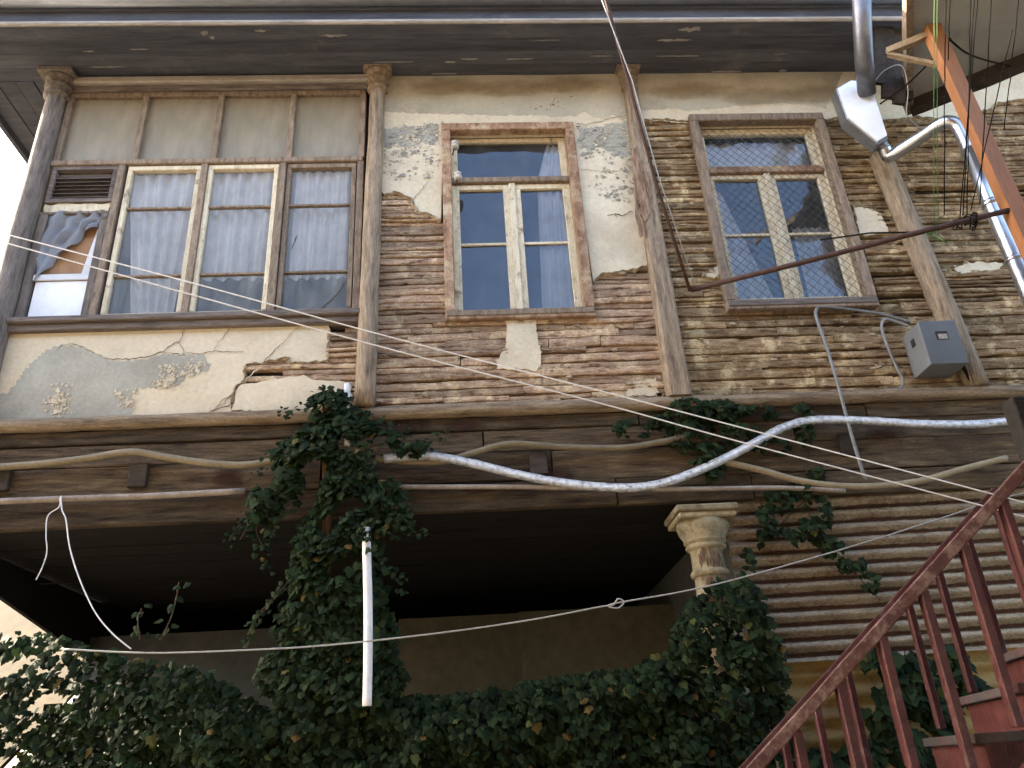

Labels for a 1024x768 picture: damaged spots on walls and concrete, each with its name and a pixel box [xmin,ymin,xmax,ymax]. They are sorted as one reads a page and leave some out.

spalling [375,121,665,407]
spalling [576,108,963,395]
peeling [0,344,211,419]
crack [51,328,299,412]
spalling [230,327,358,412]